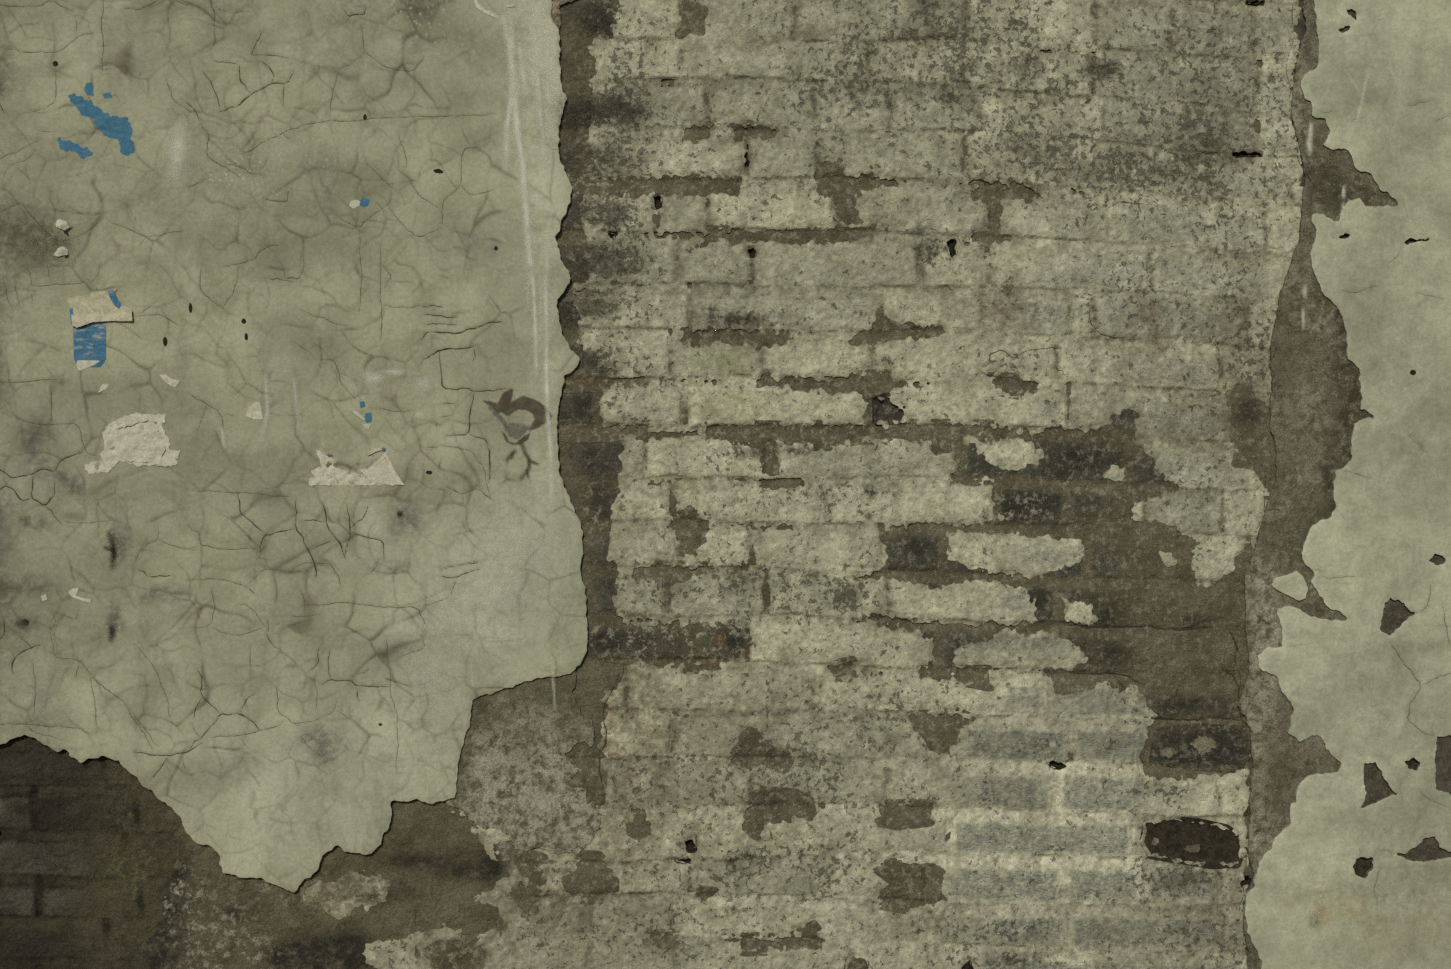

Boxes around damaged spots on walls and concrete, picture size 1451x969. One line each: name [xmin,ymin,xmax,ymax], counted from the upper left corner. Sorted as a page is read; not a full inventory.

crack [1,0,506,499]
crack [0,379,110,523]
peeling [423,0,1398,969]
crack [0,490,480,777]
peeling [1380,597,1415,636]
peeling [1429,554,1446,565]
peeling [1405,735,1451,795]
peeling [0,735,510,969]
peeling [1397,836,1451,862]